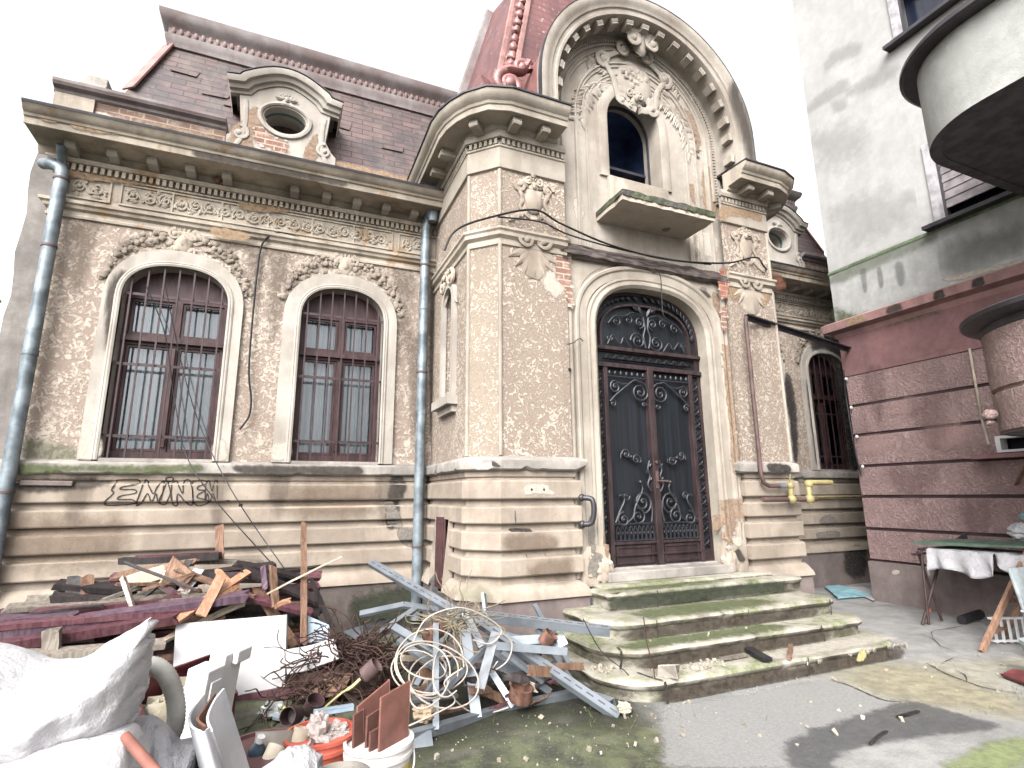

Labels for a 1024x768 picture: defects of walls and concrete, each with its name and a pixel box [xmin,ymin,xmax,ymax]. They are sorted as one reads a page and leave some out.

flaking render [142,106,289,154]
flaking render [543,255,575,309]
flaking render [696,232,741,475]
flaking render [588,516,609,577]
flaking render [712,499,745,562]
leakage [844,550,867,579]